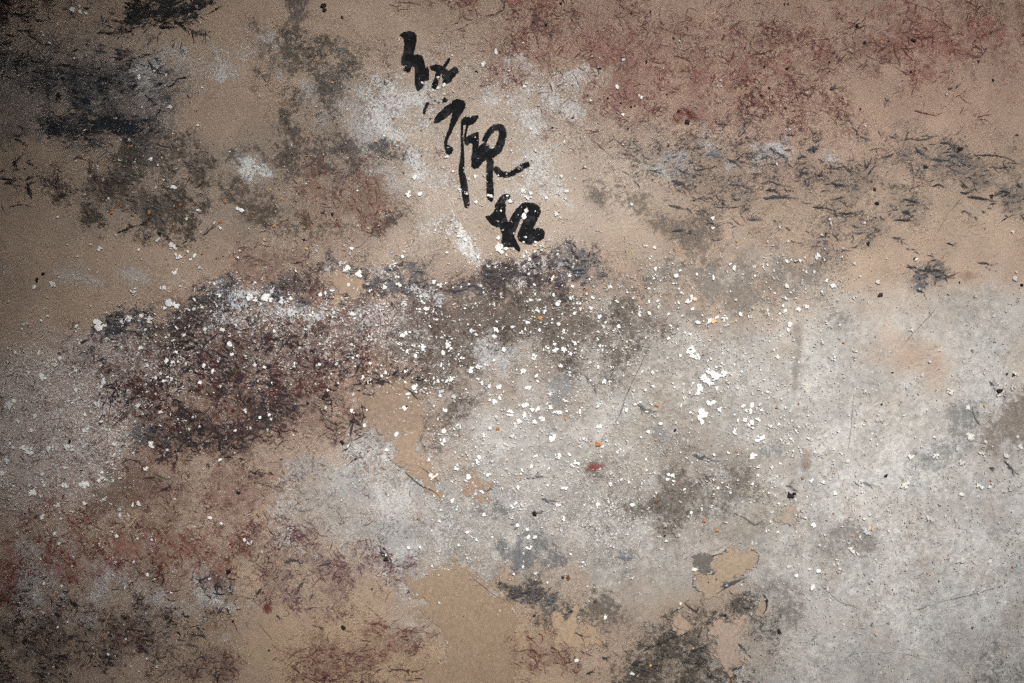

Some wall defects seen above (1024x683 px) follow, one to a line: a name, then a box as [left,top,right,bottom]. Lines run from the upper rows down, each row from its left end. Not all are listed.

damp [0,0,677,683]
damp [618,465,771,534]
flaking render [660,602,698,635]
damp [599,591,783,683]